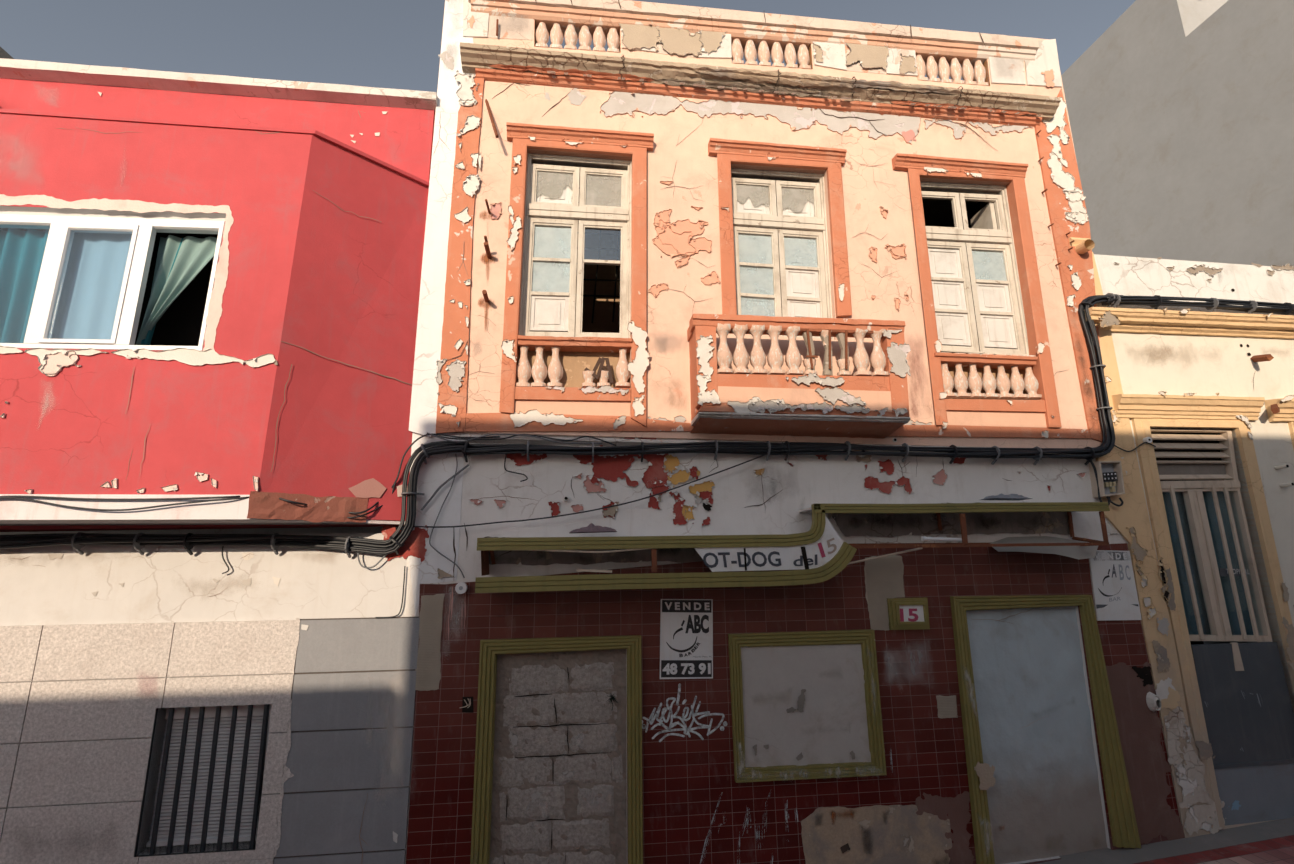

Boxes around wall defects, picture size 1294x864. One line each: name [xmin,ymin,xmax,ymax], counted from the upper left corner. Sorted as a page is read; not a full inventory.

peeling [438,51,482,223]
peeling [490,64,1089,226]
peeling [0,194,278,377]
peeling [490,202,522,251]
peeling [652,206,712,268]
flaking render [435,299,469,427]
peeling [501,339,517,362]
peeling [502,453,547,466]
peeling [543,320,715,526]
peeling [484,536,703,567]
spalling [1105,518,1226,848]
spalling [801,762,996,864]